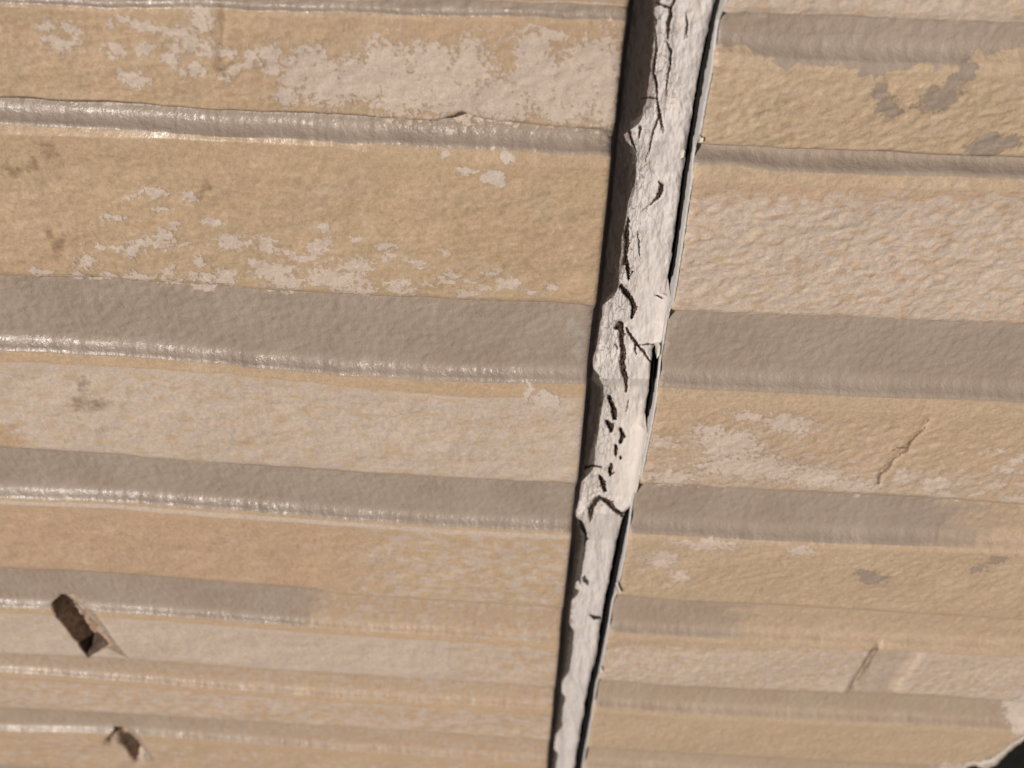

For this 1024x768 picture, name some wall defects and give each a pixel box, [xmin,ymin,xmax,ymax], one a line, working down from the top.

peeling [34,3,624,146]
crack [630,0,689,161]
peeling [69,186,560,300]
crack [623,182,663,263]
crack [616,321,654,410]
crack [877,420,929,484]
crack [580,496,624,546]